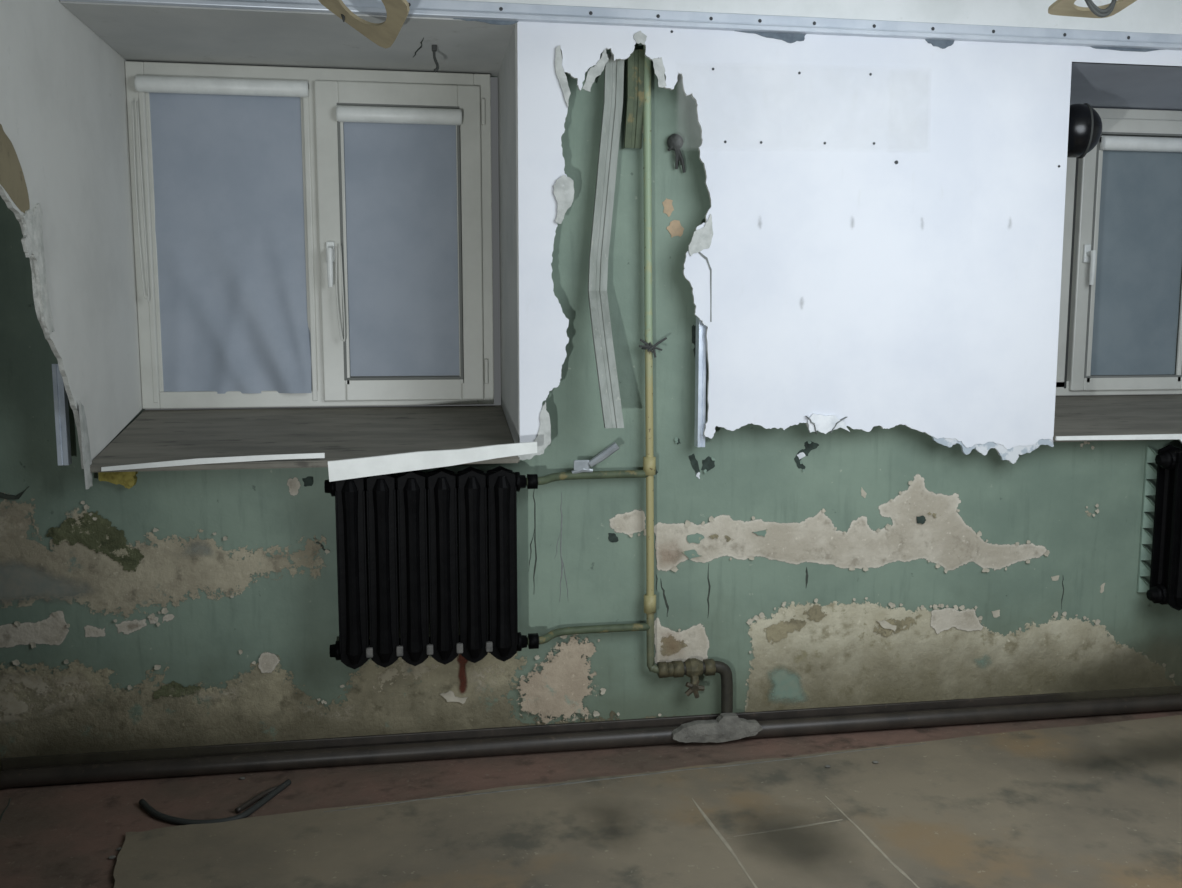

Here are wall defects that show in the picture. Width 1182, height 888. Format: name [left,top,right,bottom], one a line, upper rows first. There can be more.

peeling [0,124,30,213]
peeling [662,198,684,238]
crack [0,490,26,500]
peeling [608,474,1050,573]
peeling [0,492,620,772]
rust [457,654,468,693]
peeling [744,597,1146,712]